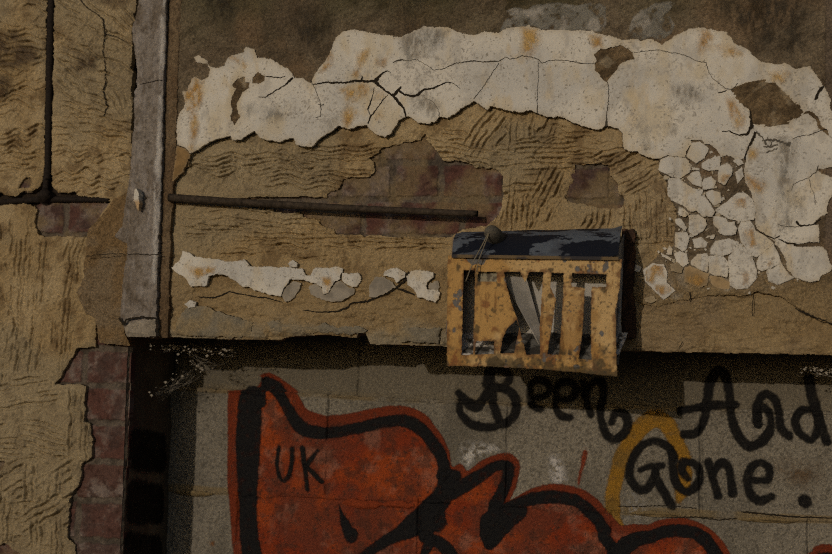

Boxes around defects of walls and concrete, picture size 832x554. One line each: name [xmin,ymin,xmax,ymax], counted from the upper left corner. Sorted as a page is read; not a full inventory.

crack [258,55,593,124]
crack [636,50,737,93]
flaking render [172,25,832,282]
spalling [36,202,110,237]
crack [634,111,821,316]
flaking render [172,251,441,303]
crack [795,308,832,324]